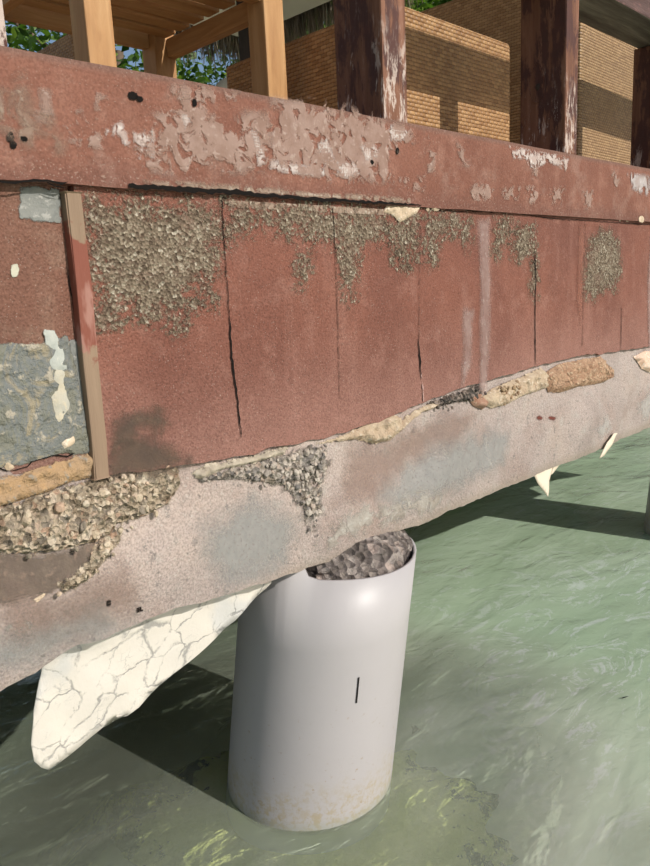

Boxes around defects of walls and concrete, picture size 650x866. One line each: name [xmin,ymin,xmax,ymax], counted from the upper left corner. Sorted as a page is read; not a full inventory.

peeling [0,88,50,149]
peeling [71,86,435,190]
peeling [471,185,538,203]
crack [522,214,650,225]
crack [129,182,493,436]
crack [530,259,538,363]
spalling [427,356,614,409]
spalling [634,351,650,373]
spalling [0,329,180,603]
spalling [199,444,330,537]